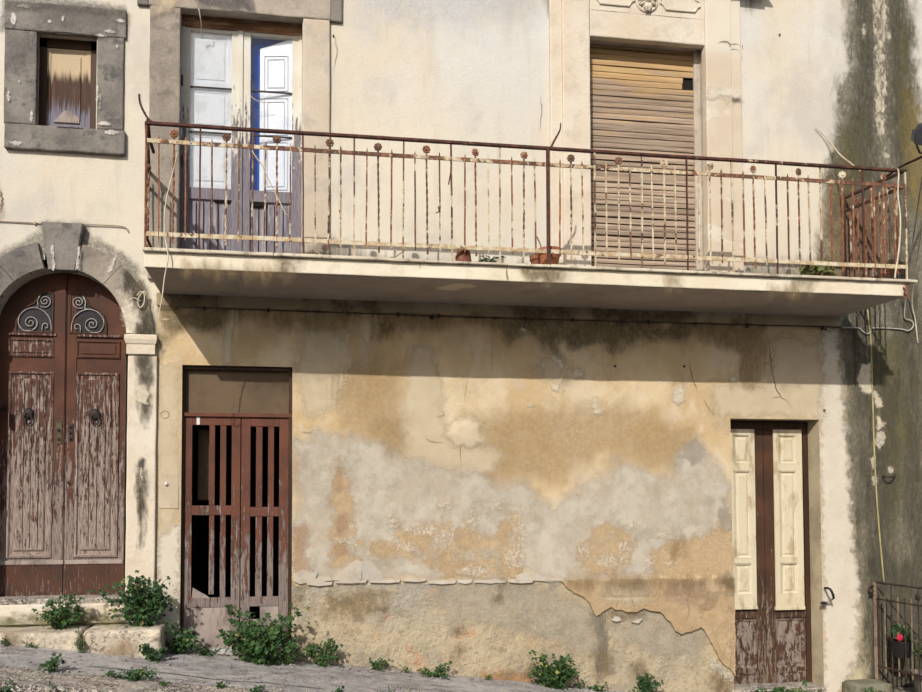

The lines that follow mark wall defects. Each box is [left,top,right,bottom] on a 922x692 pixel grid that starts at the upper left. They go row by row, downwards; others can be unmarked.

water stain [134,354,153,417]
crack [769,345,790,405]
water stain [817,0,922,688]
peeling [857,363,886,485]
water stain [136,458,146,541]
peeling [292,431,736,681]